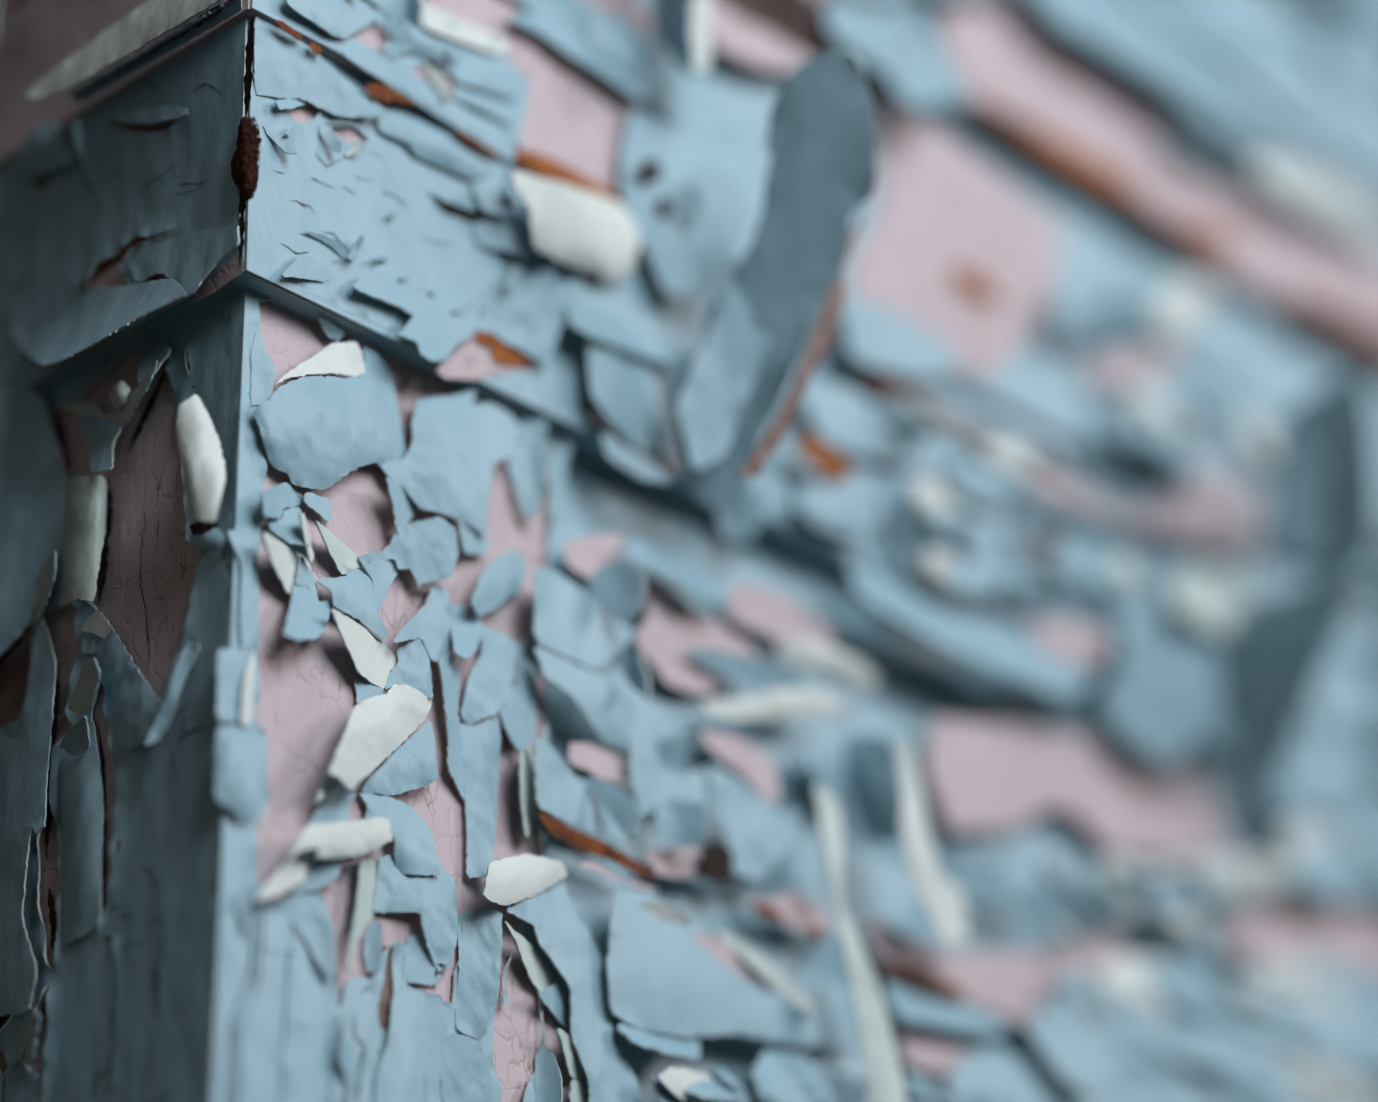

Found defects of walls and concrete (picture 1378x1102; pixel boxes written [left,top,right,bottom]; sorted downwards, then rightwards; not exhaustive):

rust [275,19,322,55]
rust [364,82,417,106]
rust [230,116,262,201]
rust [456,129,499,159]
rust [515,148,620,203]
peeling [0,0,878,1102]
peeling [711,0,1378,1102]
crack [353,945,392,1102]